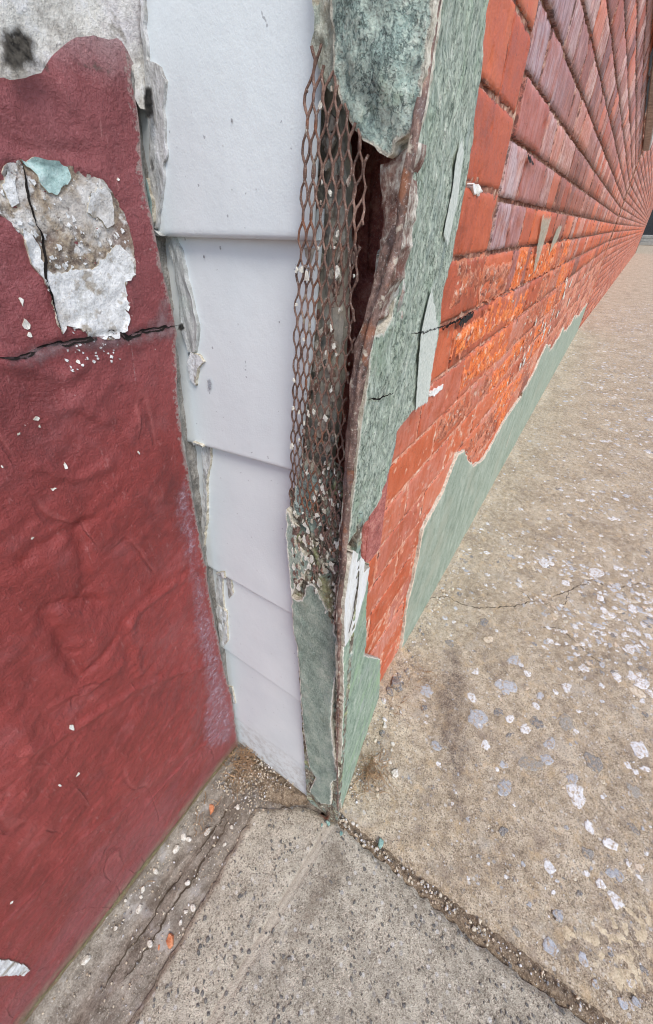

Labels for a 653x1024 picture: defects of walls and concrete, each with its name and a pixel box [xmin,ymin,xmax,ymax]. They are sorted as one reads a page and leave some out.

flaking render [318,162,351,205]
peeling [444,140,464,245]
peeling [0,157,136,372]
crack [0,163,177,360]
flaking render [317,225,360,288]
flaking render [325,305,350,377]
peeling [416,288,443,409]
crack [412,311,474,334]
spalling [433,239,590,462]
flaking render [290,385,370,647]
crack [430,580,649,663]